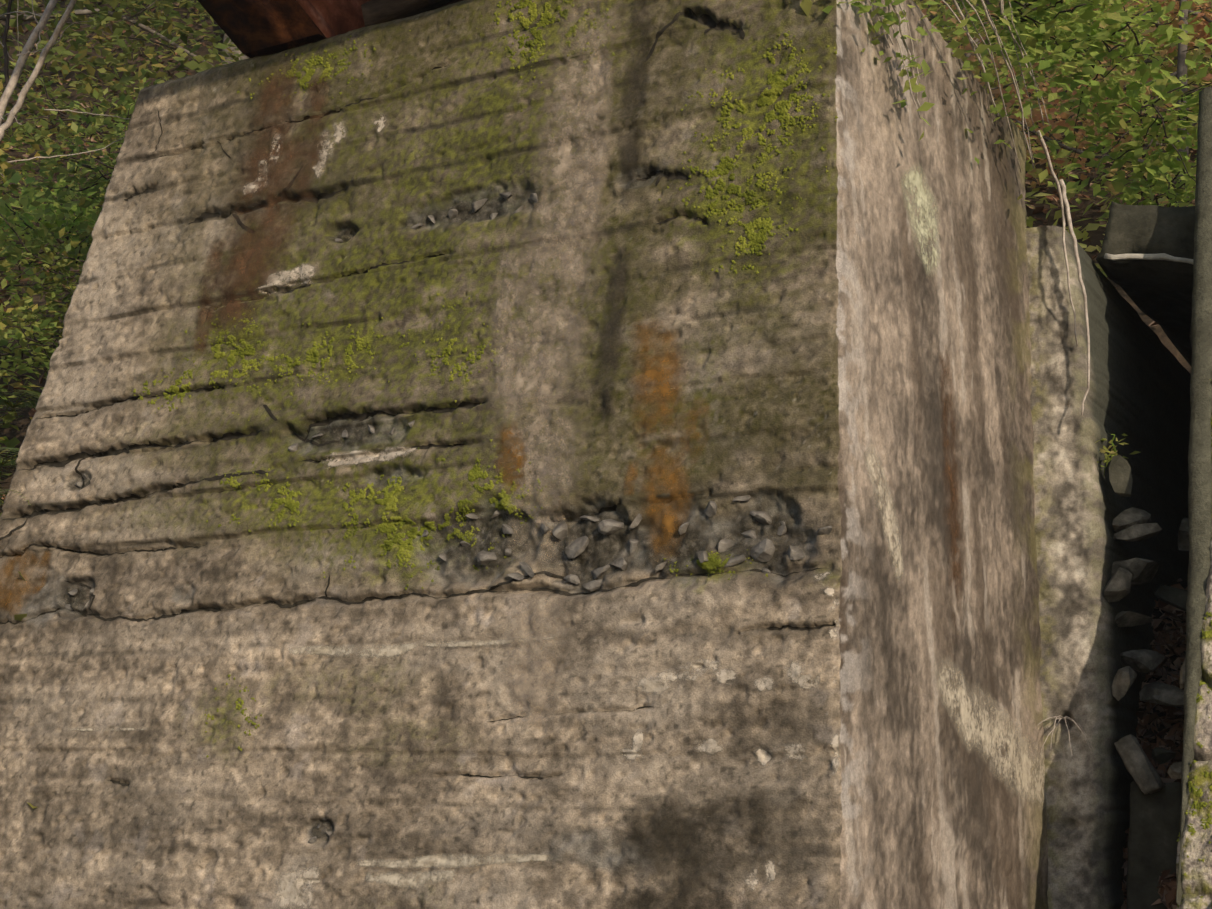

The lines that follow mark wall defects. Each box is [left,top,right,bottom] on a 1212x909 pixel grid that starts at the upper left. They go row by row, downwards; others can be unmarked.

crack [37,385,225,419]
crack [0,399,489,558]
crack [550,504,618,522]
spalling [420,495,805,592]
crack [0,568,830,625]
leakage [631,795,767,866]
leakage [622,887,706,909]